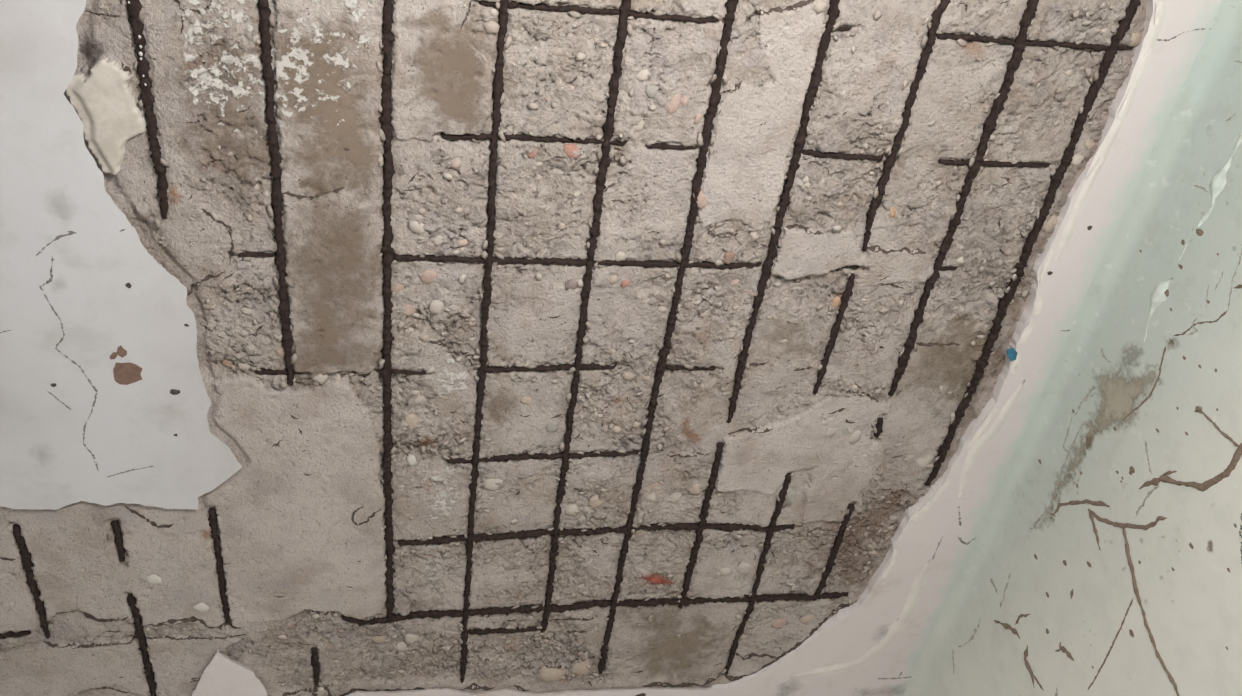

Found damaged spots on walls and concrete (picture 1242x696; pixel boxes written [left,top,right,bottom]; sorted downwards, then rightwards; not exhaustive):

spalling [0,0,388,696]
rust [640,574,672,584]
spalling [231,0,1151,696]